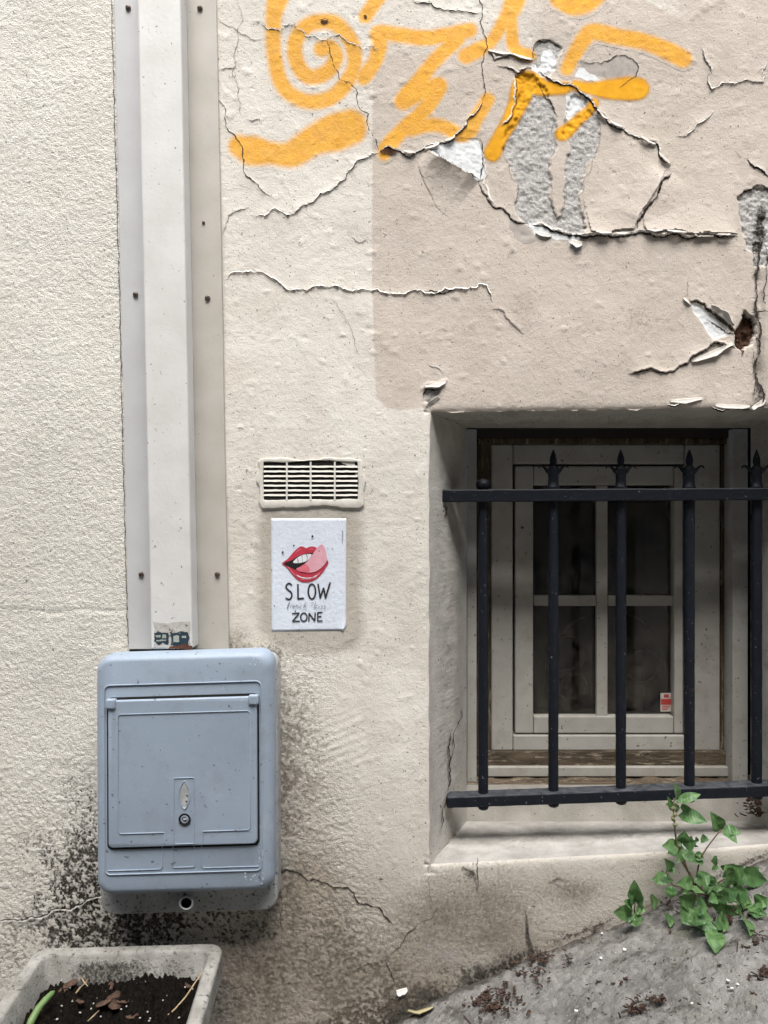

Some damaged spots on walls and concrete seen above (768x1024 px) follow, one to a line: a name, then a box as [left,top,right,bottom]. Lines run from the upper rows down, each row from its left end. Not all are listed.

peeling [575,55,639,88]
peeling [427,139,494,202]
crack [217,0,768,412]
spalling [488,40,601,255]
spalling [737,184,768,267]
peeling [631,278,735,375]
crack [441,710,463,828]
leakage [20,779,270,948]
crack [279,858,439,985]